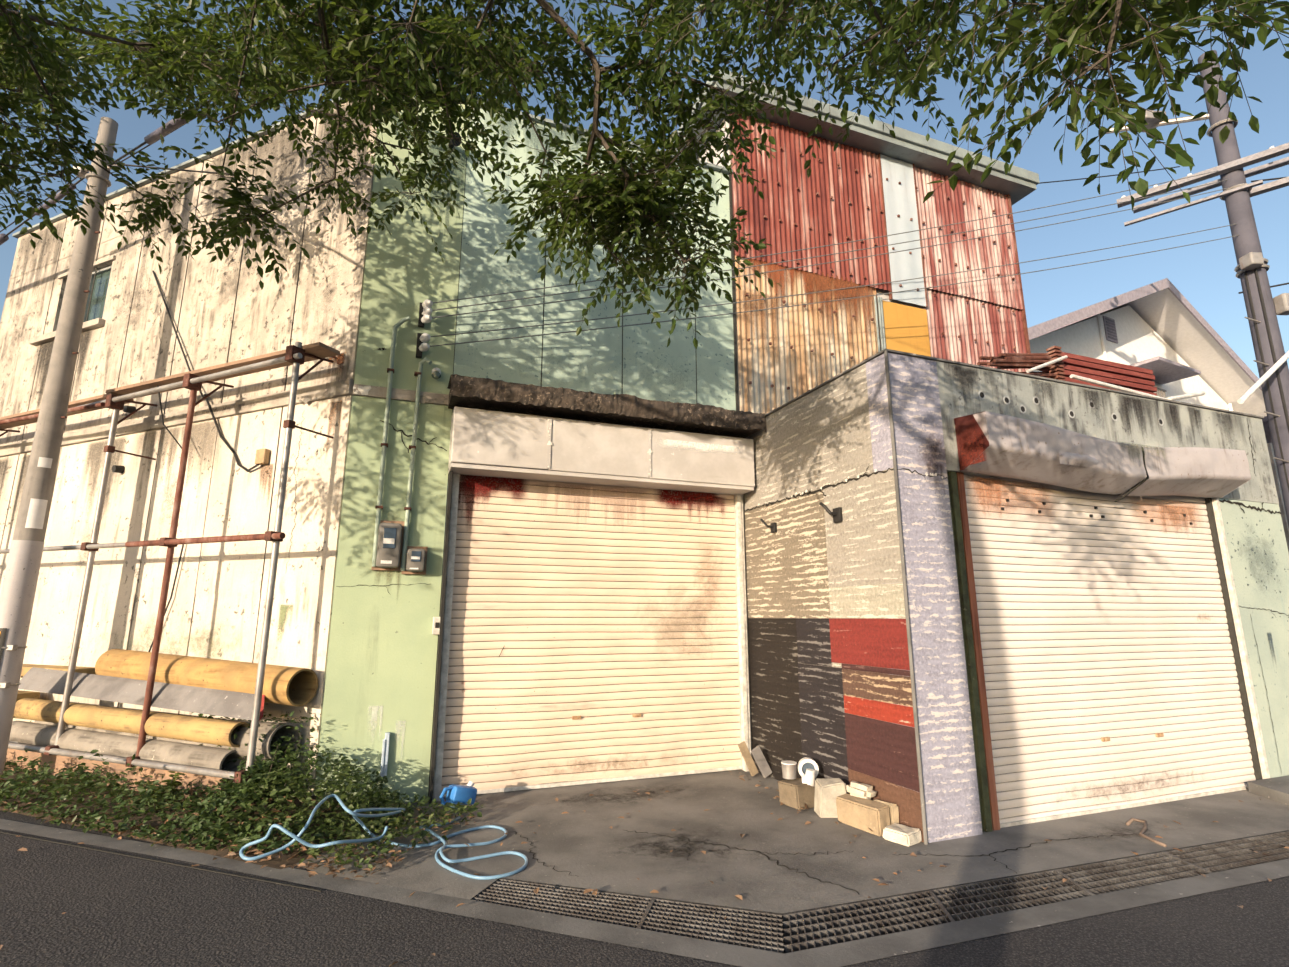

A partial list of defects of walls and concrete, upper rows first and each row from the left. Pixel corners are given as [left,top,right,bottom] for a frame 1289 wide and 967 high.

rust [743,258,871,349]
leakage [1120,396,1201,435]
leakage [0,456,30,503]
leakage [87,440,123,499]
rust [458,475,525,521]
rust [659,489,724,511]
crack [490,824,579,877]
crack [626,830,860,895]